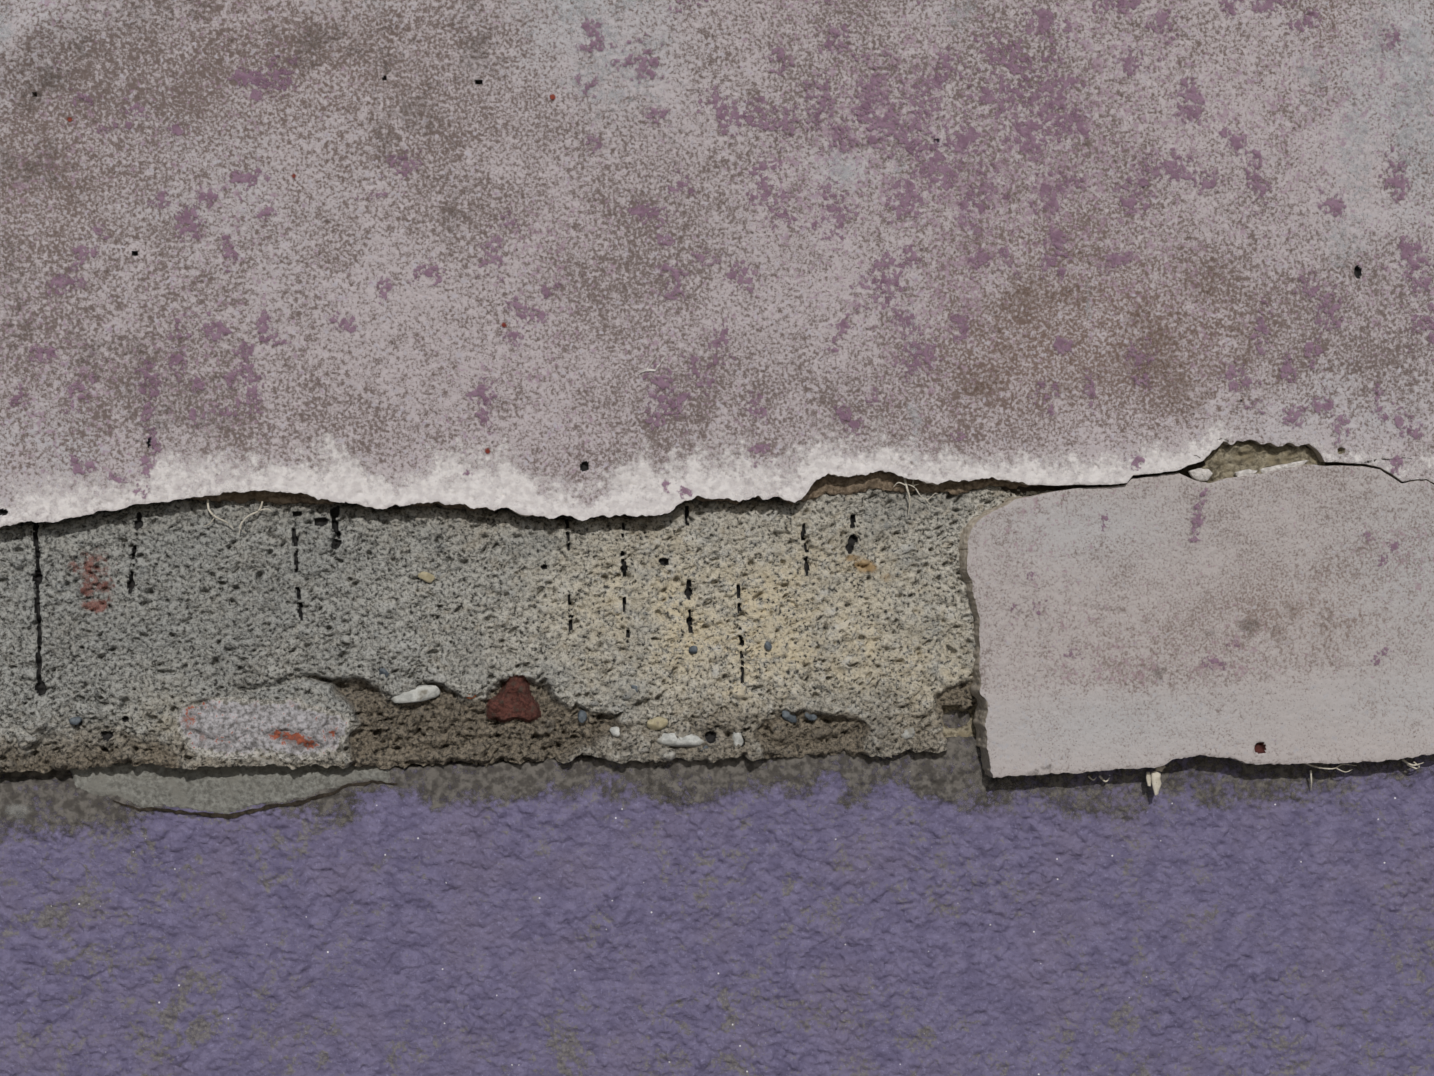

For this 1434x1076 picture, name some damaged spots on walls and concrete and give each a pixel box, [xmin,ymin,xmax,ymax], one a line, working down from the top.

peeling [628,170,695,246]
peeling [376,275,392,304]
peeling [409,259,450,286]
peeling [655,251,756,300]
peeling [822,244,973,382]
peeling [1280,271,1348,383]
crack [1001,438,1229,503]
crack [1325,457,1413,483]
crack [0,508,47,696]
spalling [0,310,1434,842]